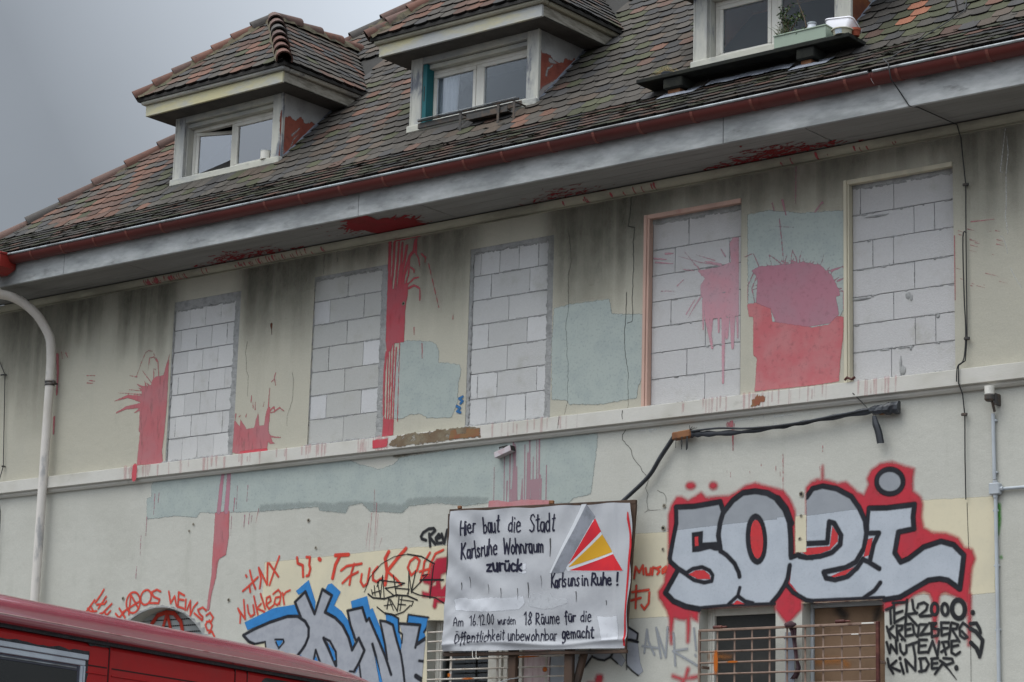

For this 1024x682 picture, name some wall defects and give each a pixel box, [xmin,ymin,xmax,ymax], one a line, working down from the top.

peeling [389,426,481,447]
crack [622,196,666,511]